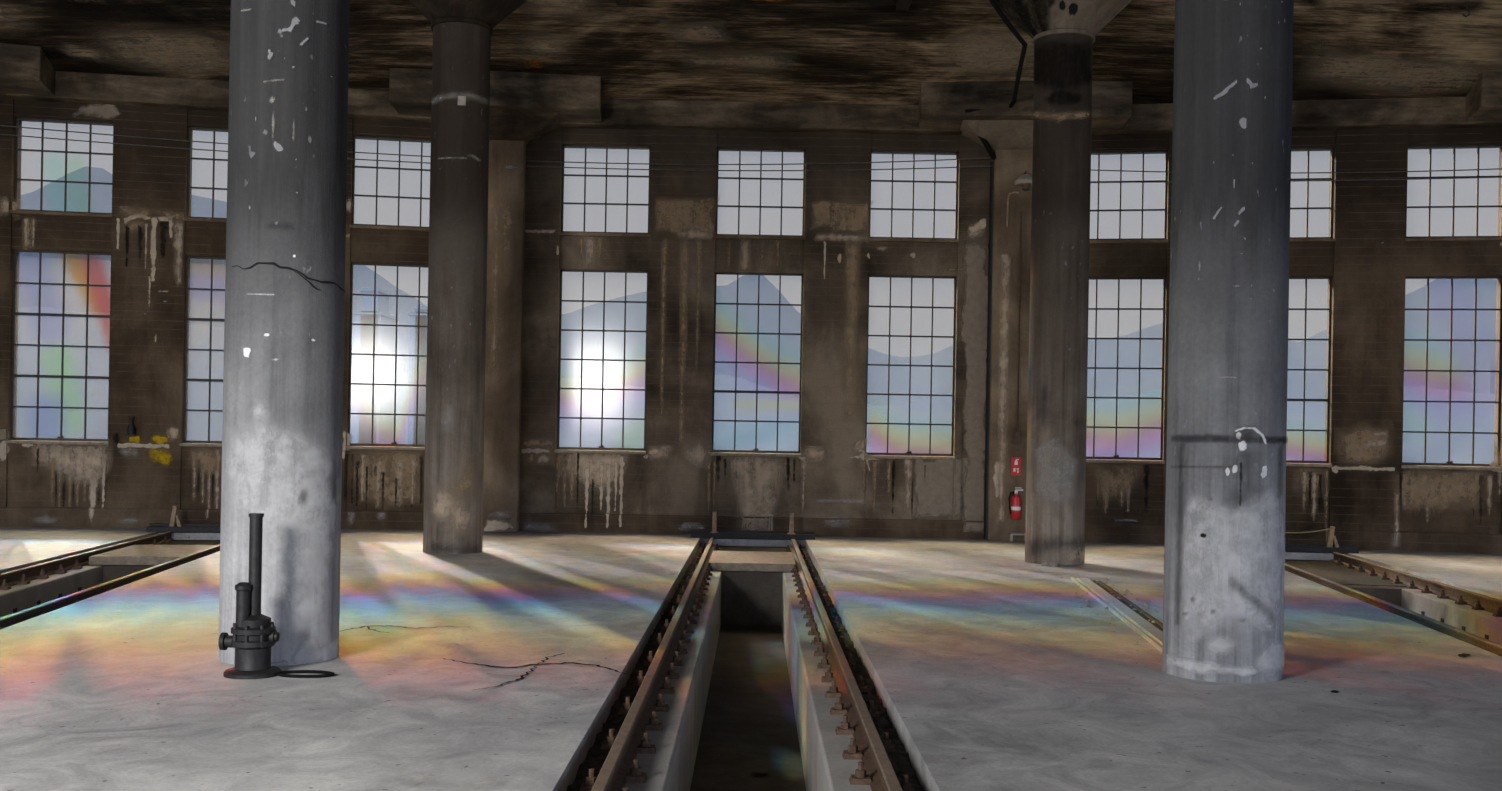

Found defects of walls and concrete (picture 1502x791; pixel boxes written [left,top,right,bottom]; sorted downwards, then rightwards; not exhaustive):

leakage [0,200,34,247]
leakage [116,208,184,304]
crack [232,262,346,292]
leakage [36,444,107,519]
leakage [193,432,423,617]
crack [339,625,631,690]